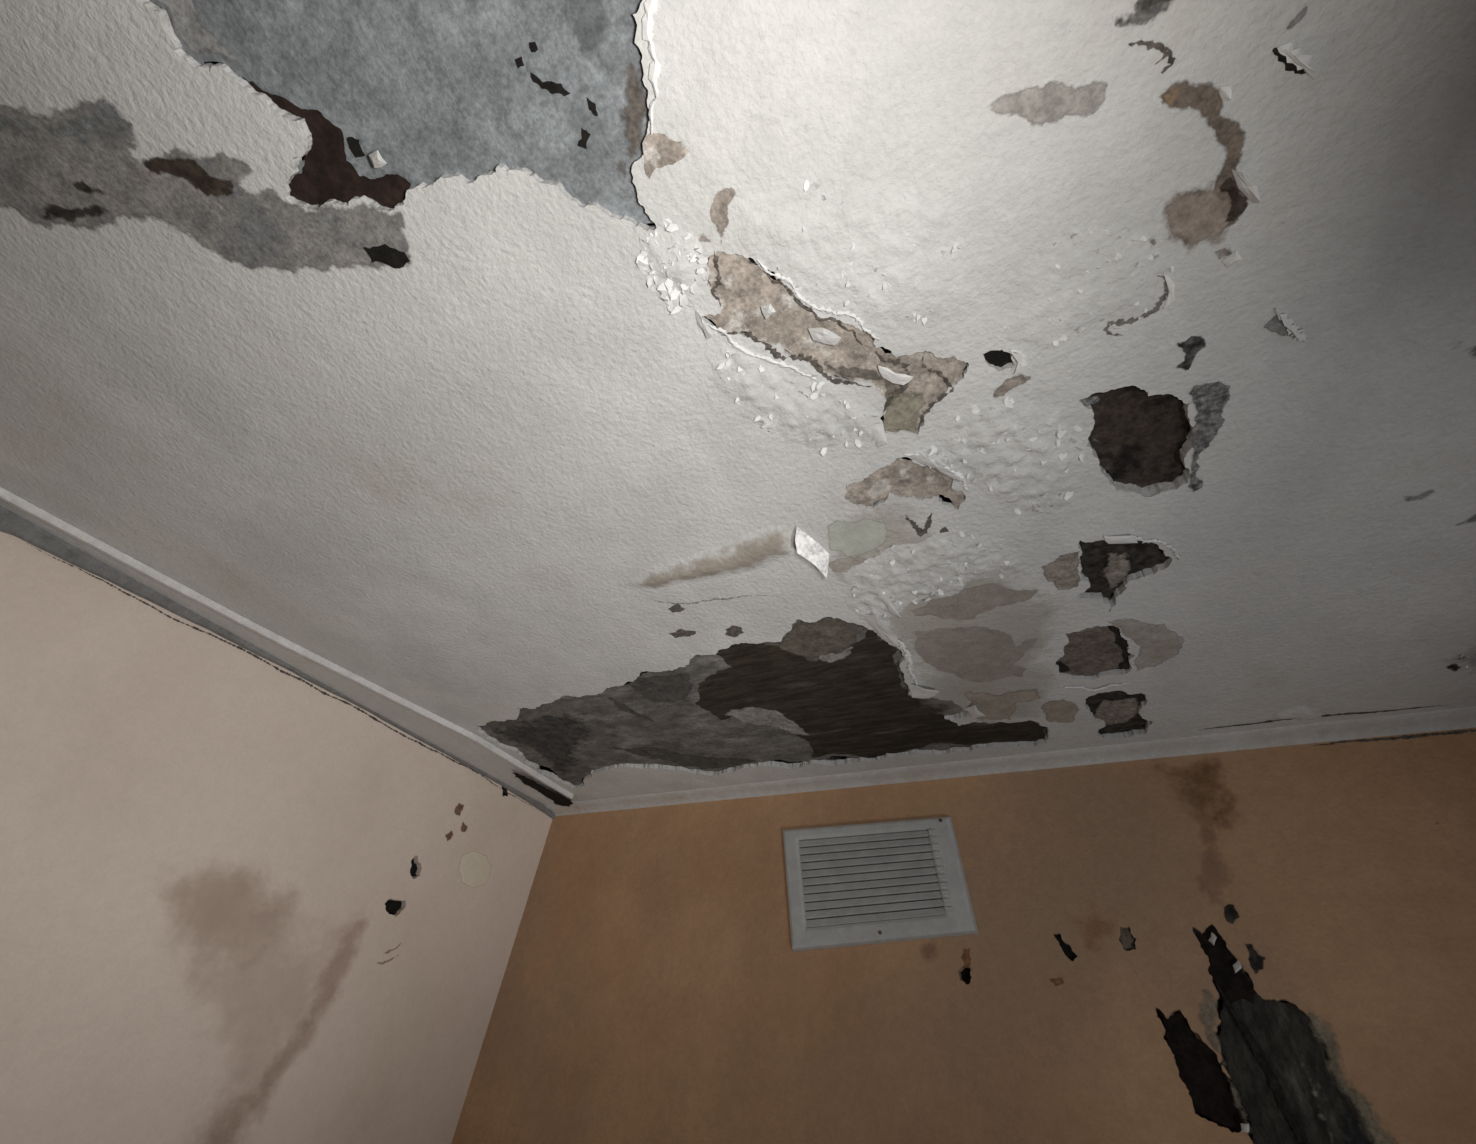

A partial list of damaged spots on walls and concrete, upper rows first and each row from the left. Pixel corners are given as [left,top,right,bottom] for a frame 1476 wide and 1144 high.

spalling [0,0,692,273]
peeling [992,82,1108,125]
peeling [1151,81,1261,268]
peeling [696,188,970,578]
spalling [1080,336,1230,492]
spalling [480,535,1184,786]
peeling [446,804,467,841]